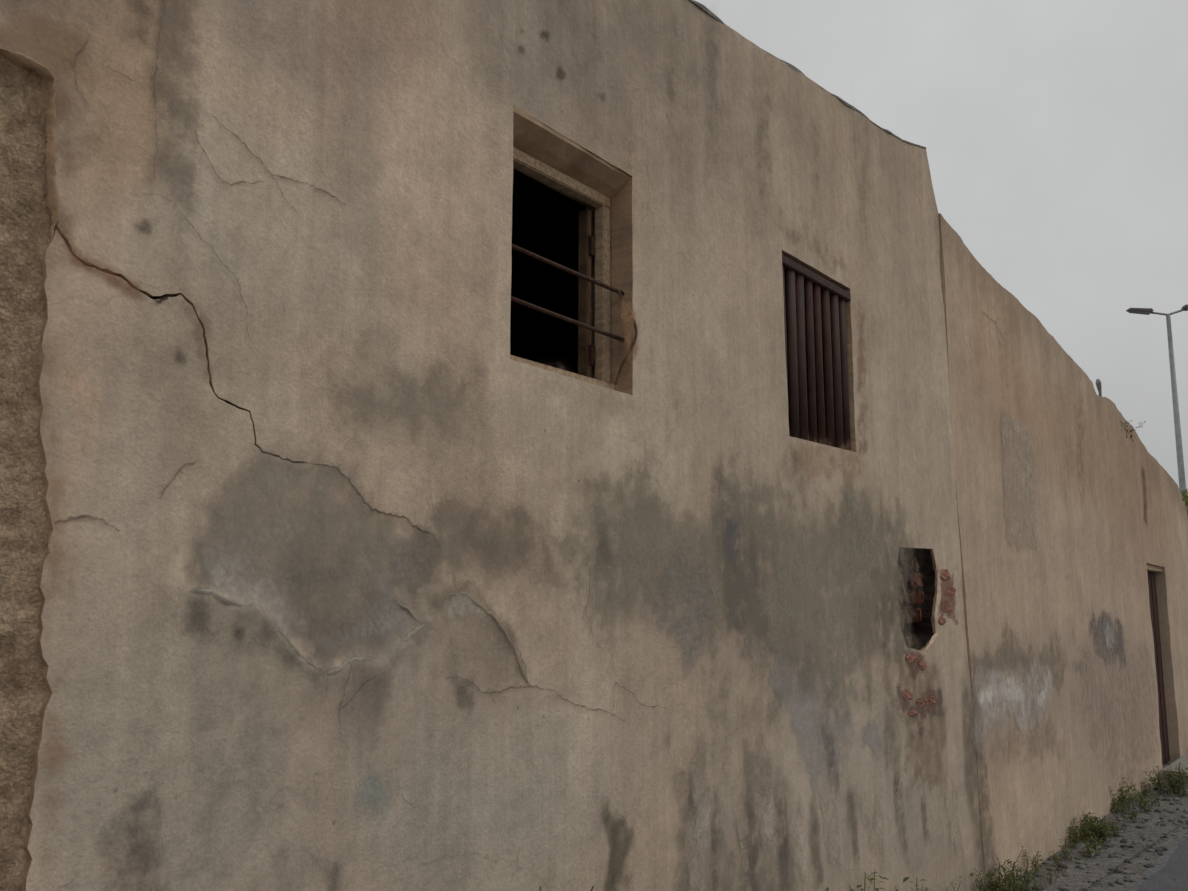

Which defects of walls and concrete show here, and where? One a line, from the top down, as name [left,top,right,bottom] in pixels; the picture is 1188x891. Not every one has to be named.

crack [195,116,346,223]
crack [54,225,249,412]
crack [54,515,119,531]
crack [161,461,195,496]
crack [255,445,441,550]
crack [446,654,665,721]
damp [573,477,908,779]
hole [897,548,958,780]
damp [605,810,630,891]
damp [683,754,842,891]